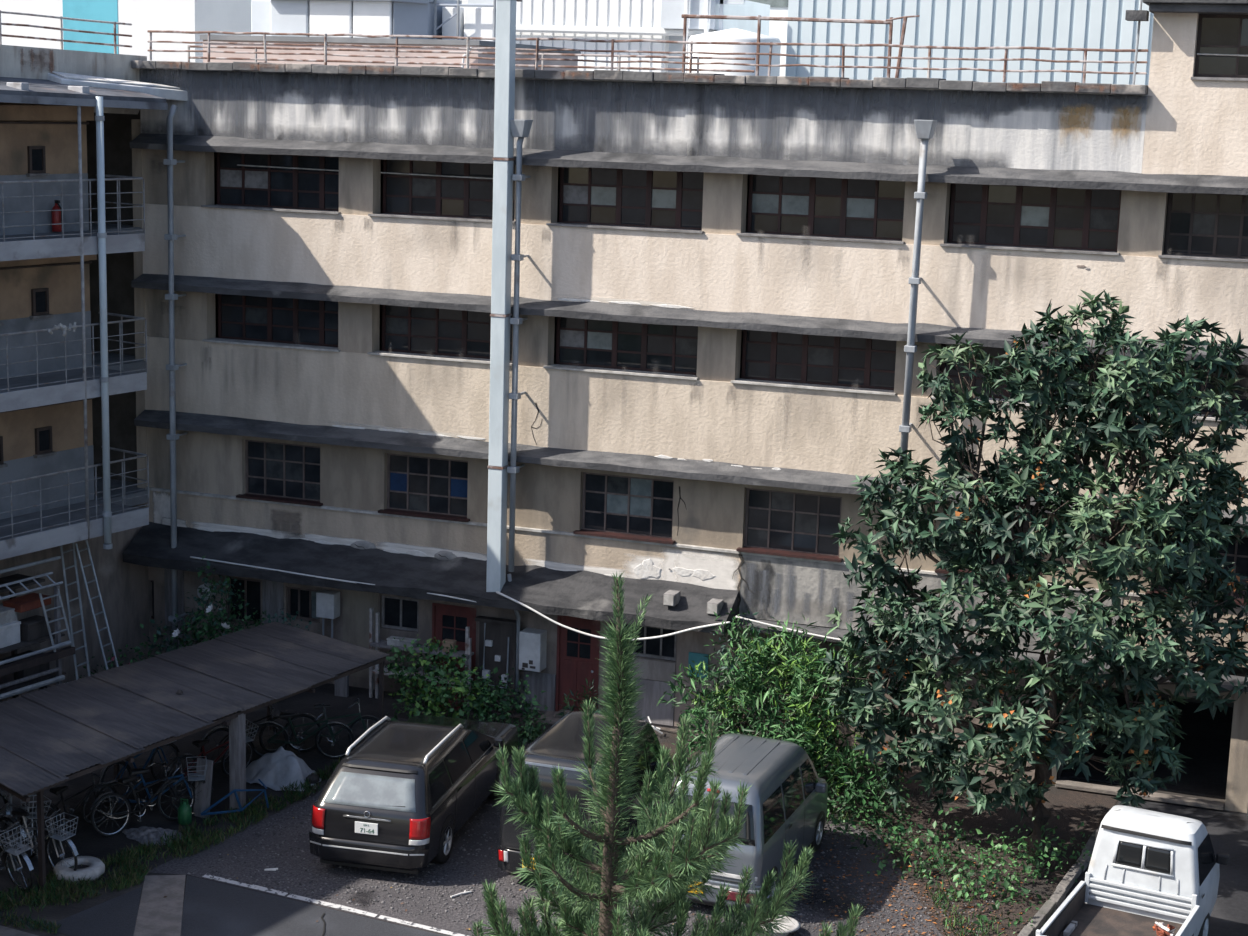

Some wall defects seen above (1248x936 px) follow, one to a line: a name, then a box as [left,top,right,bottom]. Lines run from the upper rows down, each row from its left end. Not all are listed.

leakage [139,69,495,148]
leakage [525,80,1147,168]
flaking render [526,550,738,590]
crack [732,554,754,608]